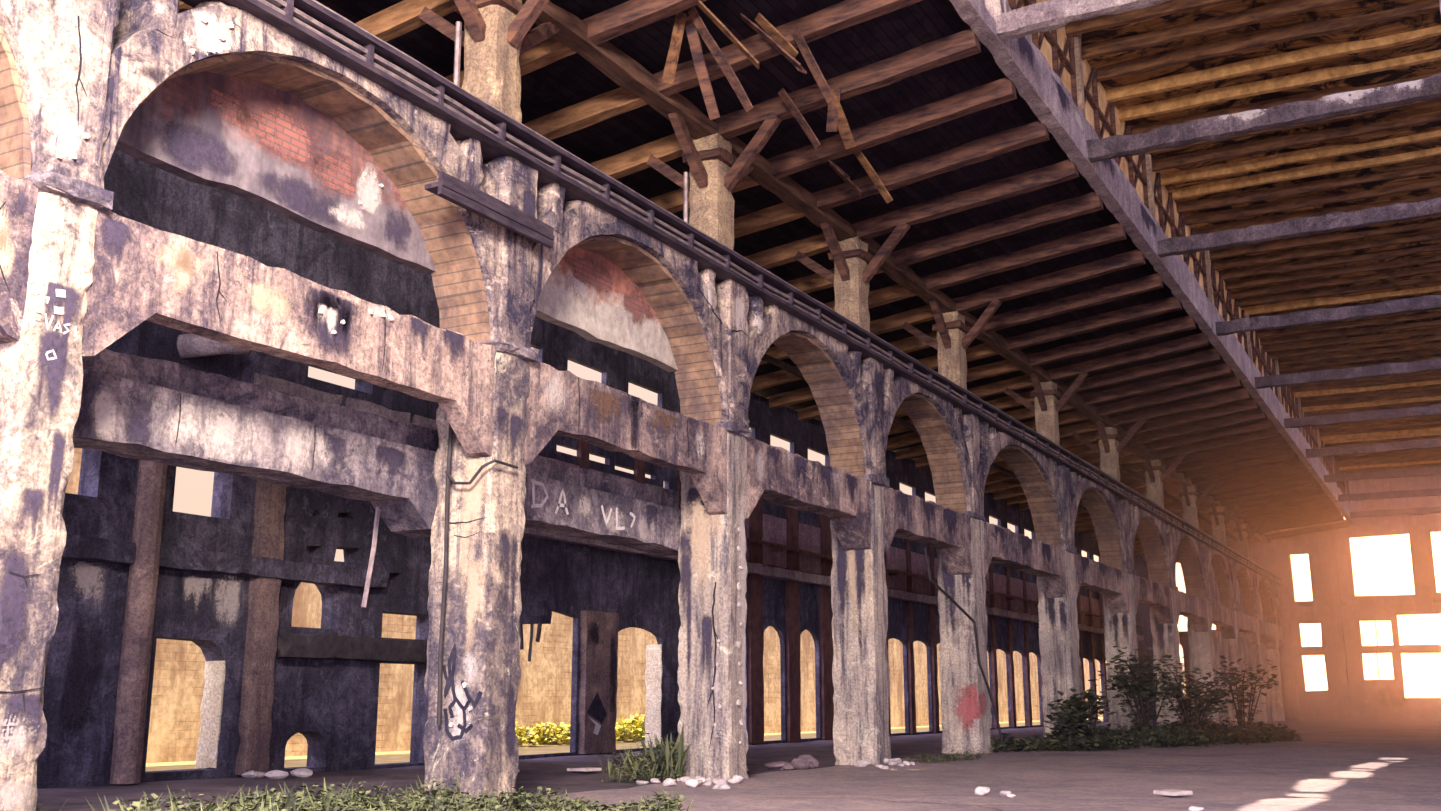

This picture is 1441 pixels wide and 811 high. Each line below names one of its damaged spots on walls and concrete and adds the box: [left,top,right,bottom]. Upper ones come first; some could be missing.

leakage [162,122,236,174]
flaking render [209,89,384,228]
leakage [263,174,336,223]
leakage [384,211,411,246]
peeling [162,245,200,286]
peeling [253,284,288,317]
peeling [304,288,393,353]
flaking render [563,256,652,323]
leakage [0,546,31,670]